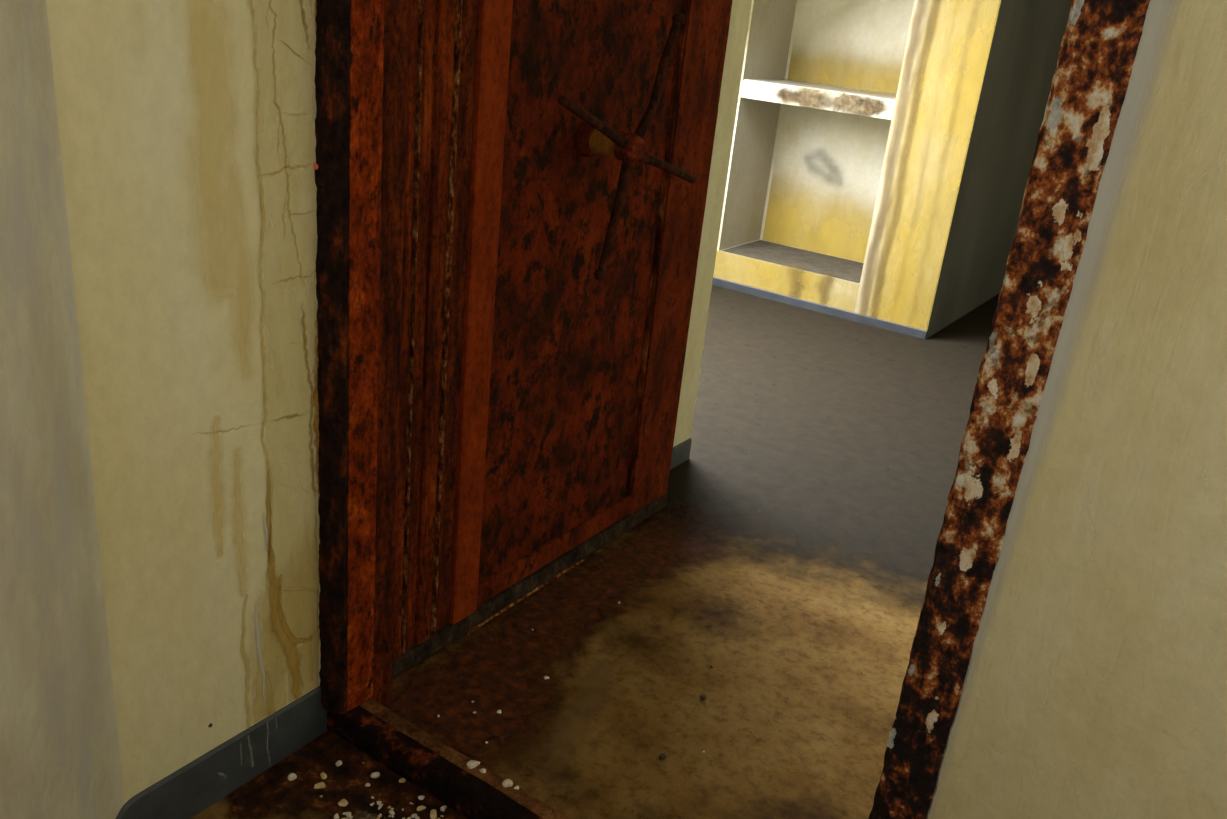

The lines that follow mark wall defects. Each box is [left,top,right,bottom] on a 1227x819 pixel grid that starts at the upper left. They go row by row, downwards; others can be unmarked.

crack [285,315,314,489]
leakage [215,419,320,767]